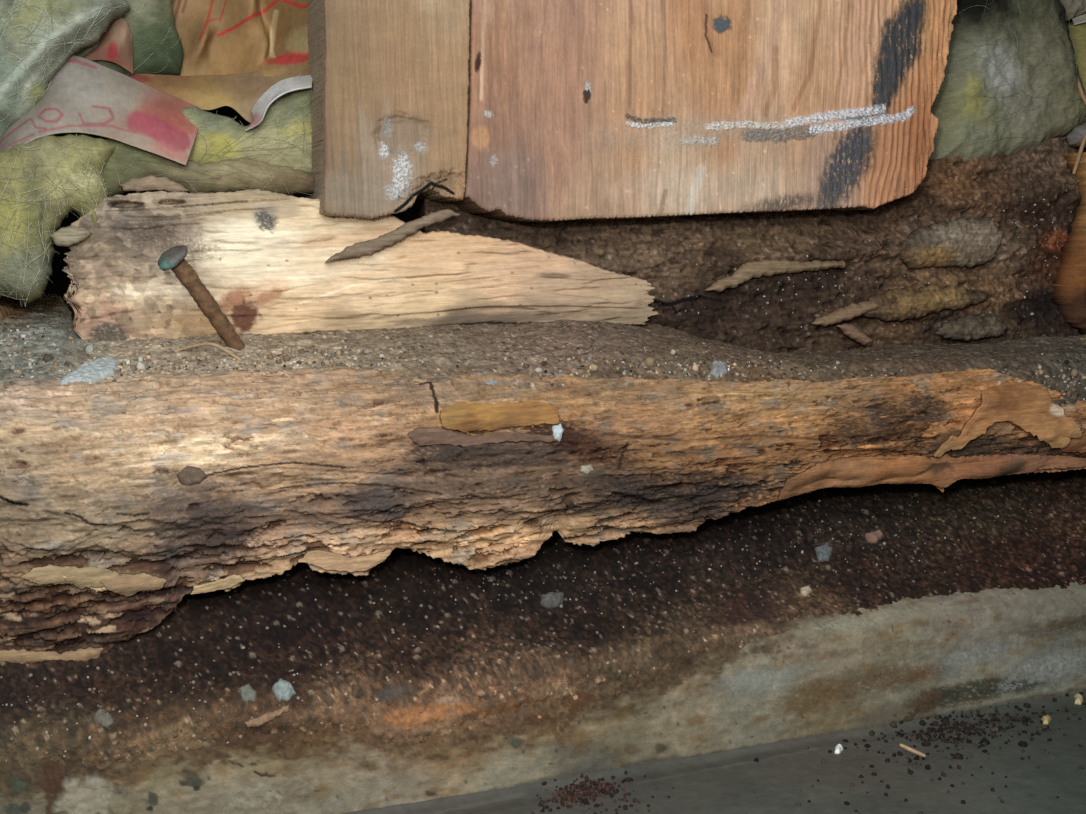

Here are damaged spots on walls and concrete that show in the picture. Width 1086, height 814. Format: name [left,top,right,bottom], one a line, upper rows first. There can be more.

peeling [298,549,392,572]
peeling [21,564,167,597]
peeling [190,573,246,595]
water stain [904,653,1085,721]
water stain [180,773,202,790]